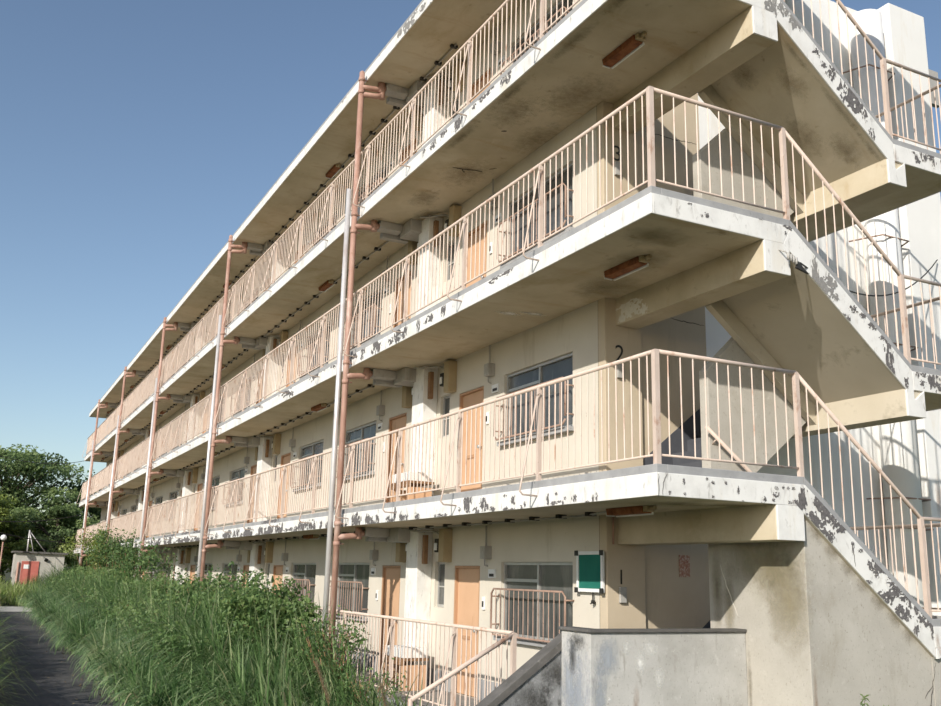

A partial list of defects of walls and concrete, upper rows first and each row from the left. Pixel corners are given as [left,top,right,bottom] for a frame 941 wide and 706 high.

peeling [764,0,801,31]
peeling [423,70,512,152]
peeling [812,48,875,140]
peeling [912,151,941,167]
peeling [809,256,839,301]
peeling [350,305,446,361]
spalling [616,298,648,323]
peeling [843,305,941,393]
peeling [546,492,597,506]
peeling [761,486,934,638]